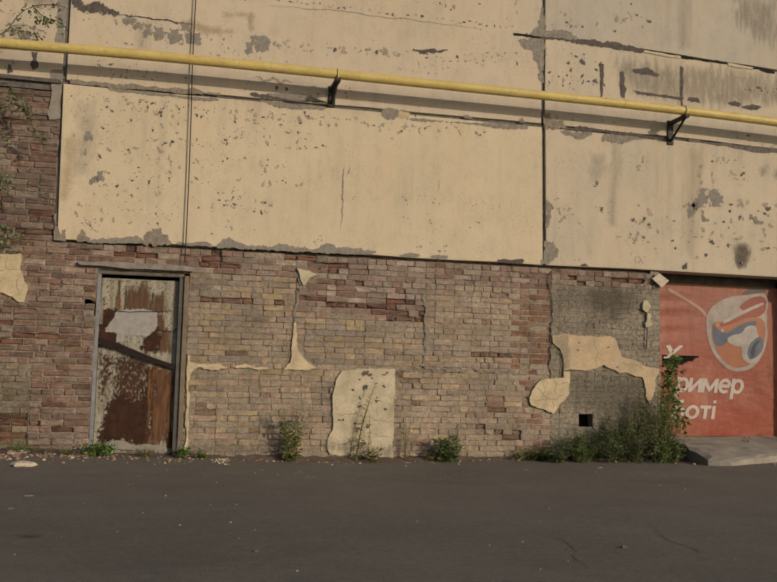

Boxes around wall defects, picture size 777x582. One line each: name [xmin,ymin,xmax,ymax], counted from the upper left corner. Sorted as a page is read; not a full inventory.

peeling [210,35,290,60]
peeling [326,1,666,97]
peeling [15,58,528,259]
spalling [199,220,363,274]
peeling [616,204,659,255]
peeling [682,135,777,260]
rust [96,280,174,449]